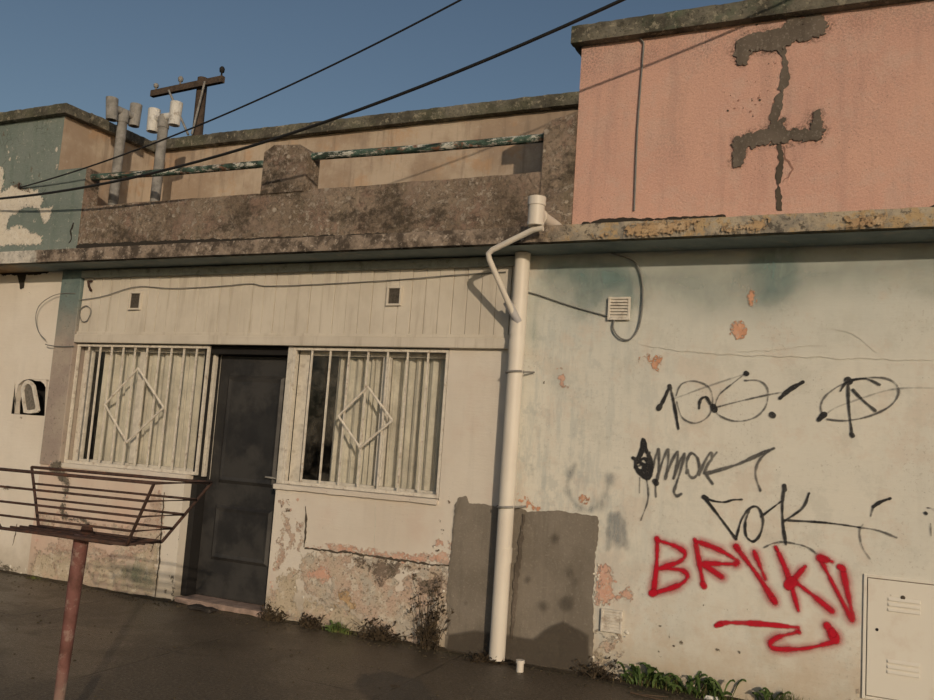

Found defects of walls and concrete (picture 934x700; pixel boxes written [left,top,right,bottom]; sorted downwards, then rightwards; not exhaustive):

crack [724,13,832,211]
peeling [0,132,53,247]
peeling [638,354,663,371]
peeling [730,320,747,340]
flaking render [0,460,175,596]
flaking render [266,498,451,644]
peeling [593,563,634,606]
flaking render [592,618,629,676]